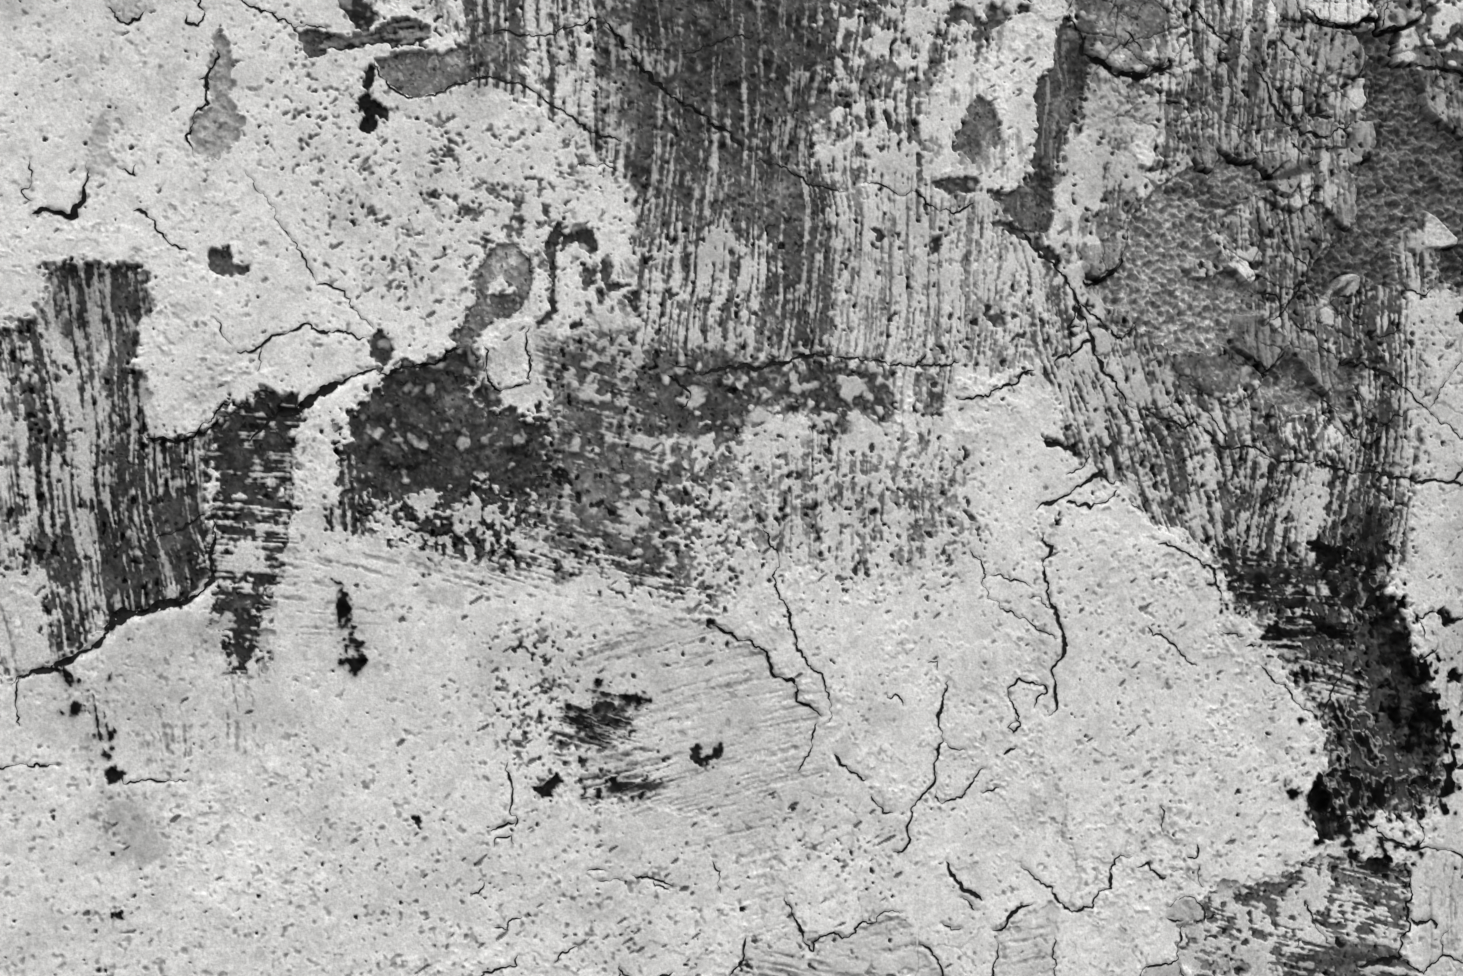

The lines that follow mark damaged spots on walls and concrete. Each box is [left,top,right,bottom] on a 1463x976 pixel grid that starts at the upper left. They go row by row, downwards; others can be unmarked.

peeling [0,258,307,684]
crack [185,0,220,158]
peeling [323,243,562,570]
peeling [933,19,1092,238]
crack [667,225,1463,487]
spalling [1084,132,1368,418]
spalling [1300,0,1463,302]
crack [711,439,1144,853]
crack [1159,542,1346,719]
crack [920,807,1217,976]
peeling [1174,850,1417,976]
crack [1337,815,1463,974]